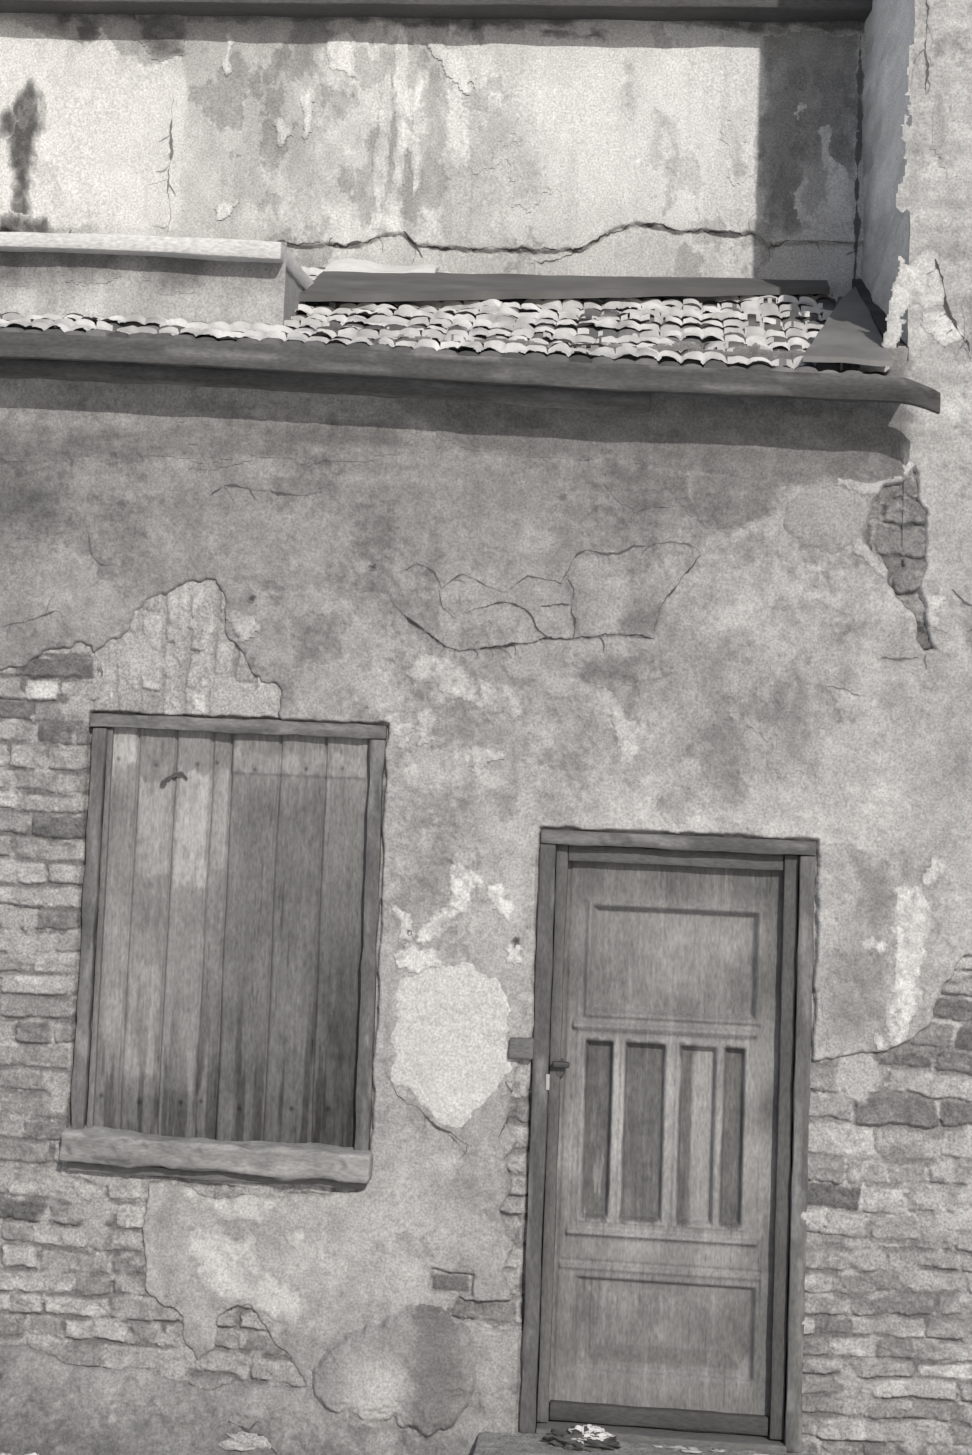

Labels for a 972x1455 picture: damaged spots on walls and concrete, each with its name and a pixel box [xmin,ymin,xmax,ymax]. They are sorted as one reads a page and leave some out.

water stain [0,77,56,233]
crack [149,99,176,232]
water stain [466,95,554,213]
crack [226,35,864,279]
water stain [616,58,683,175]
water stain [720,30,863,242]
flaking render [882,248,963,348]
crack [391,542,700,658]
flaking render [836,451,948,650]
flaking render [0,579,357,1390]
flaking render [430,1059,532,1330]
flaking render [798,855,972,1455]